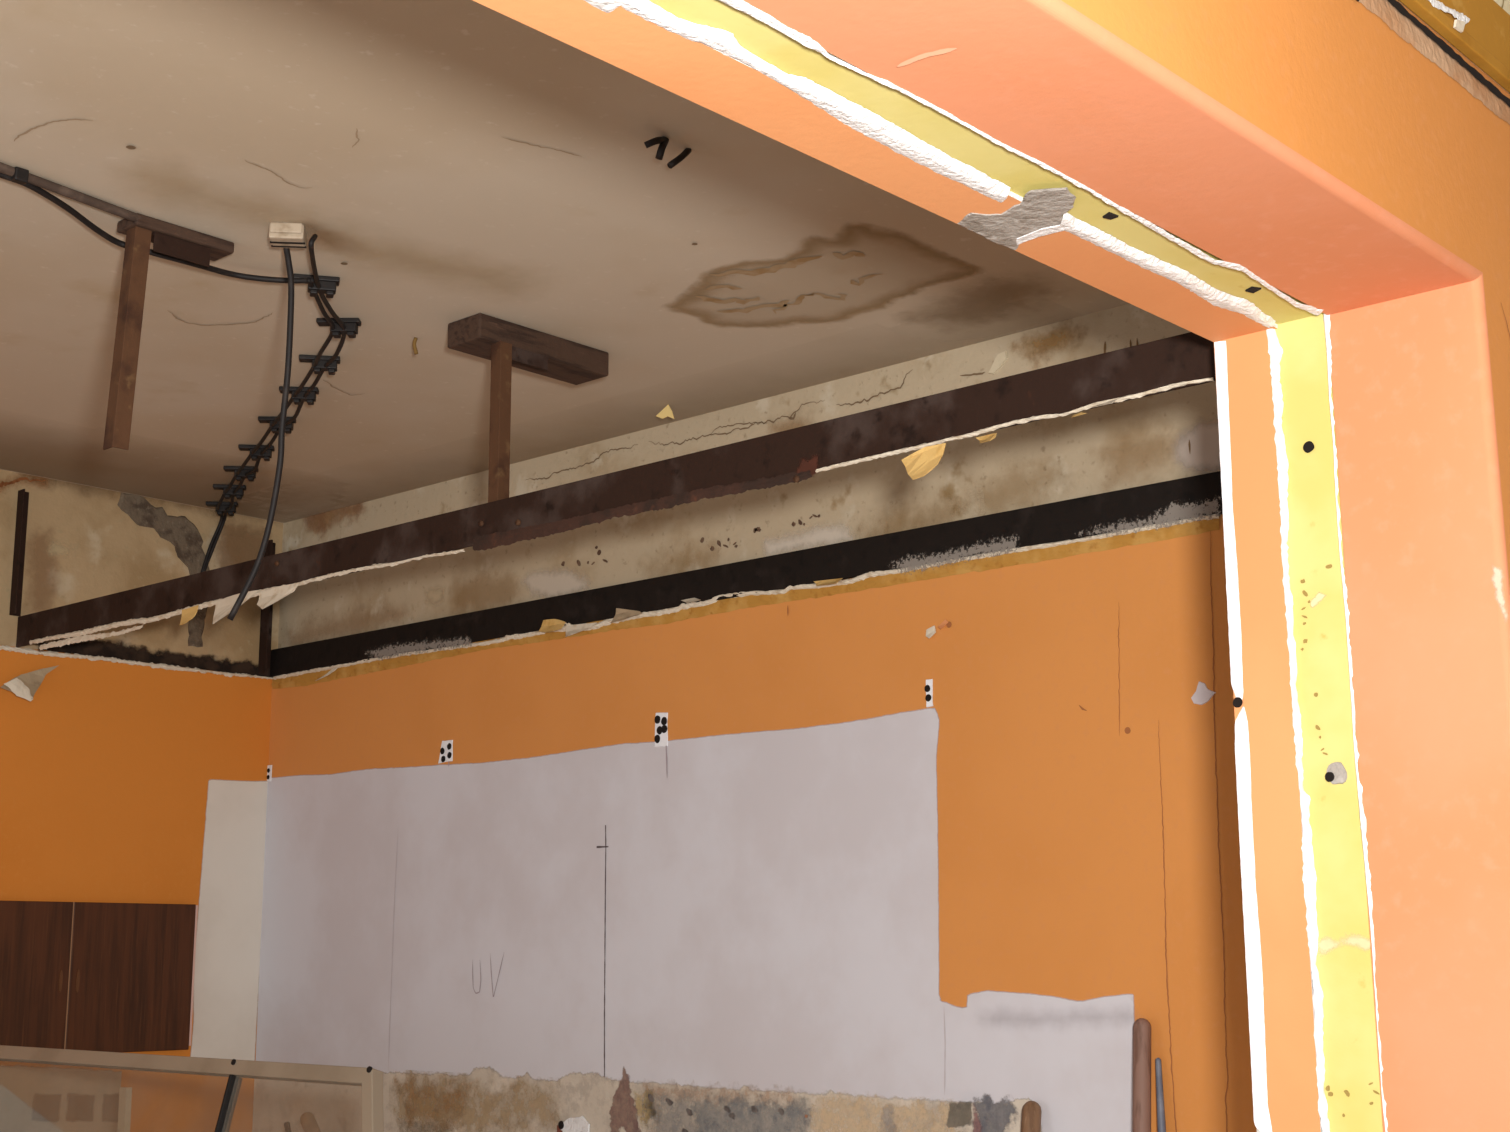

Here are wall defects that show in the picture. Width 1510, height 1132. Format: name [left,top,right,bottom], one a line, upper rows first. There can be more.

water stain [679,227,974,326]
crack [526,370,912,480]
rust [473,455,818,551]
spalling [584,0,1388,1132]
peeling [539,608,642,637]
flaking render [252,1079,362,1132]
flaking render [383,1067,1032,1132]